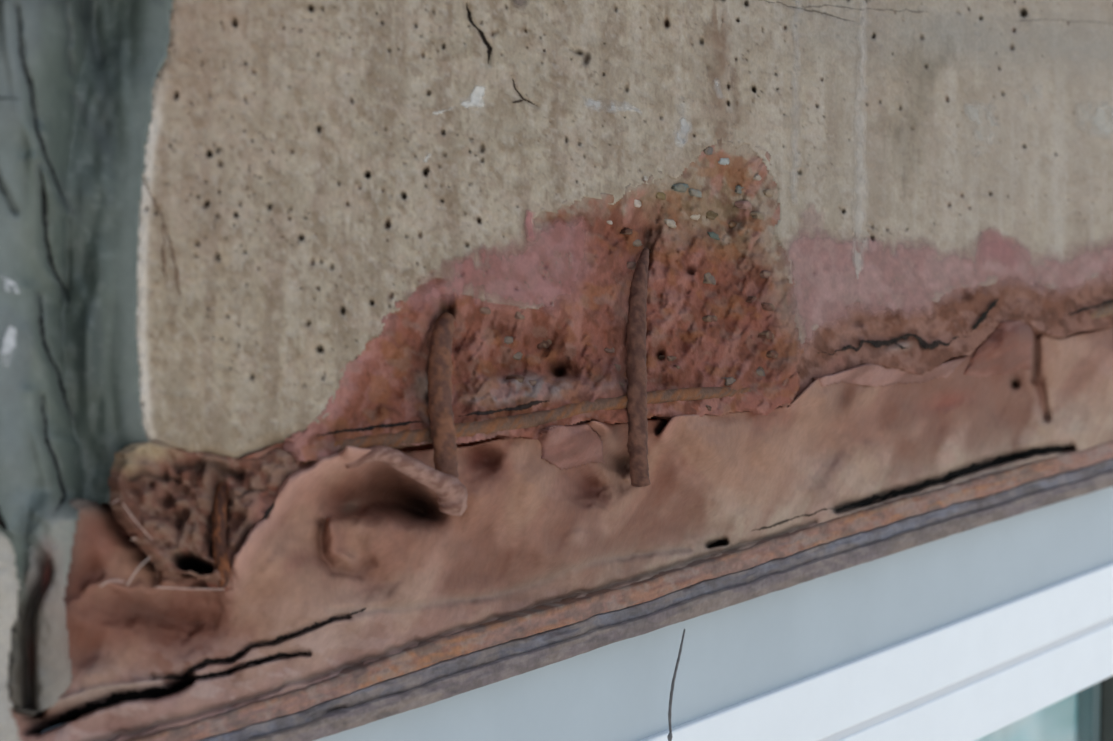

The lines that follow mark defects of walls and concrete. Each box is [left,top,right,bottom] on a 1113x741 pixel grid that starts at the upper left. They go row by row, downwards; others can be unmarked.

crack [466,3,492,64]
crack [512,79,537,106]
corrosion [788,235,1113,340]
spalling [108,138,1113,592]
crack [316,421,424,436]
crack [459,400,549,417]
crack [262,502,275,520]
crack [759,446,1070,530]
crack [709,539,726,547]
crack [28,608,366,734]